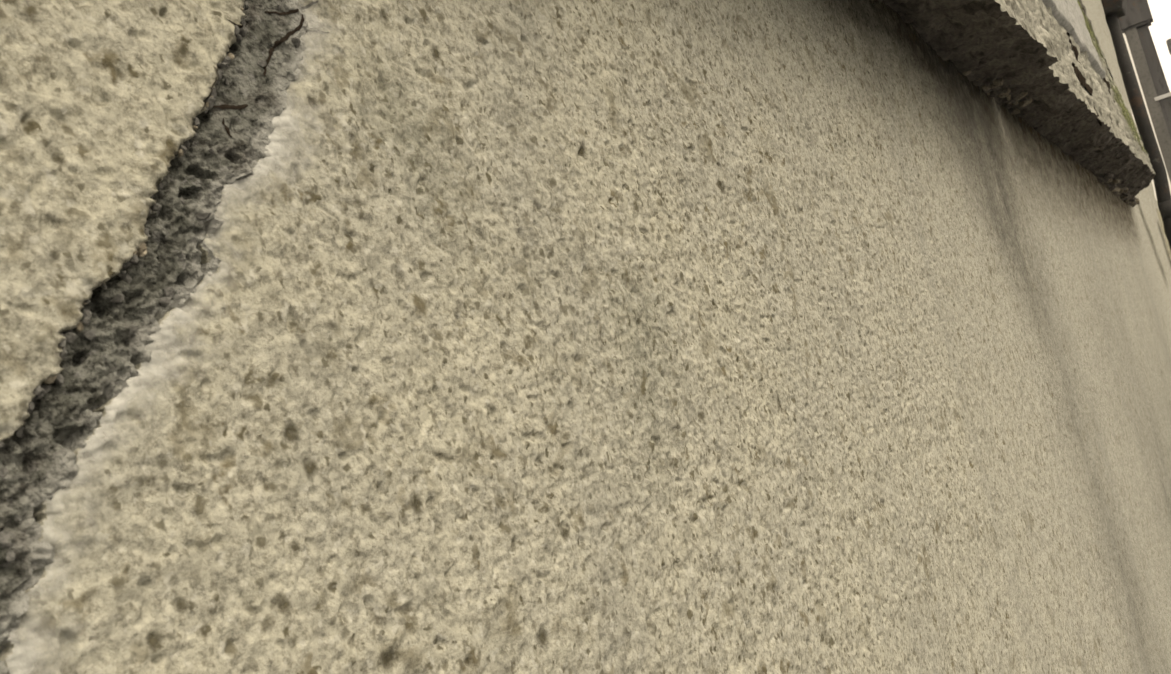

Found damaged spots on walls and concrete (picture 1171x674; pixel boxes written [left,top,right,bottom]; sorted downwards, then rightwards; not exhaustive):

peeling [1042,0,1106,79]
leakage [201,99,297,251]
spalling [1098,172,1140,207]
leakage [190,262,227,297]
crack [0,0,329,674]
leakage [42,308,185,542]
leakage [27,561,57,593]
leakage [5,638,34,674]